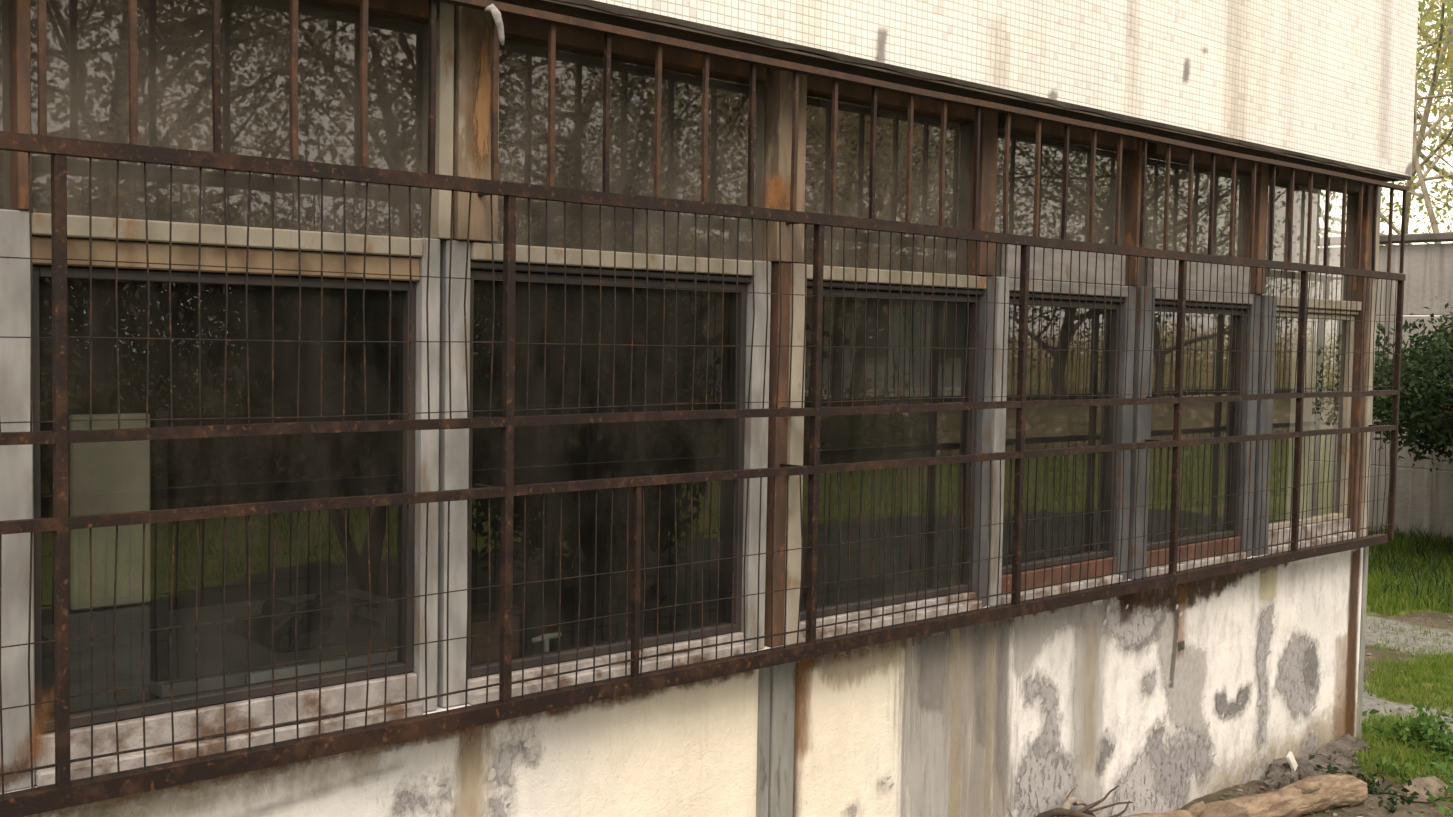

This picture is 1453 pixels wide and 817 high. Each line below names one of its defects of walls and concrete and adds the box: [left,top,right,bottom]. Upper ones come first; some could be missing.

rust [1105,563,1288,622]
peeling [392,777,456,817]
rust [345,688,665,817]
peeling [488,736,540,817]
water stain [900,602,1109,817]
peeling [1010,672,1078,817]
peeling [1096,604,1321,817]